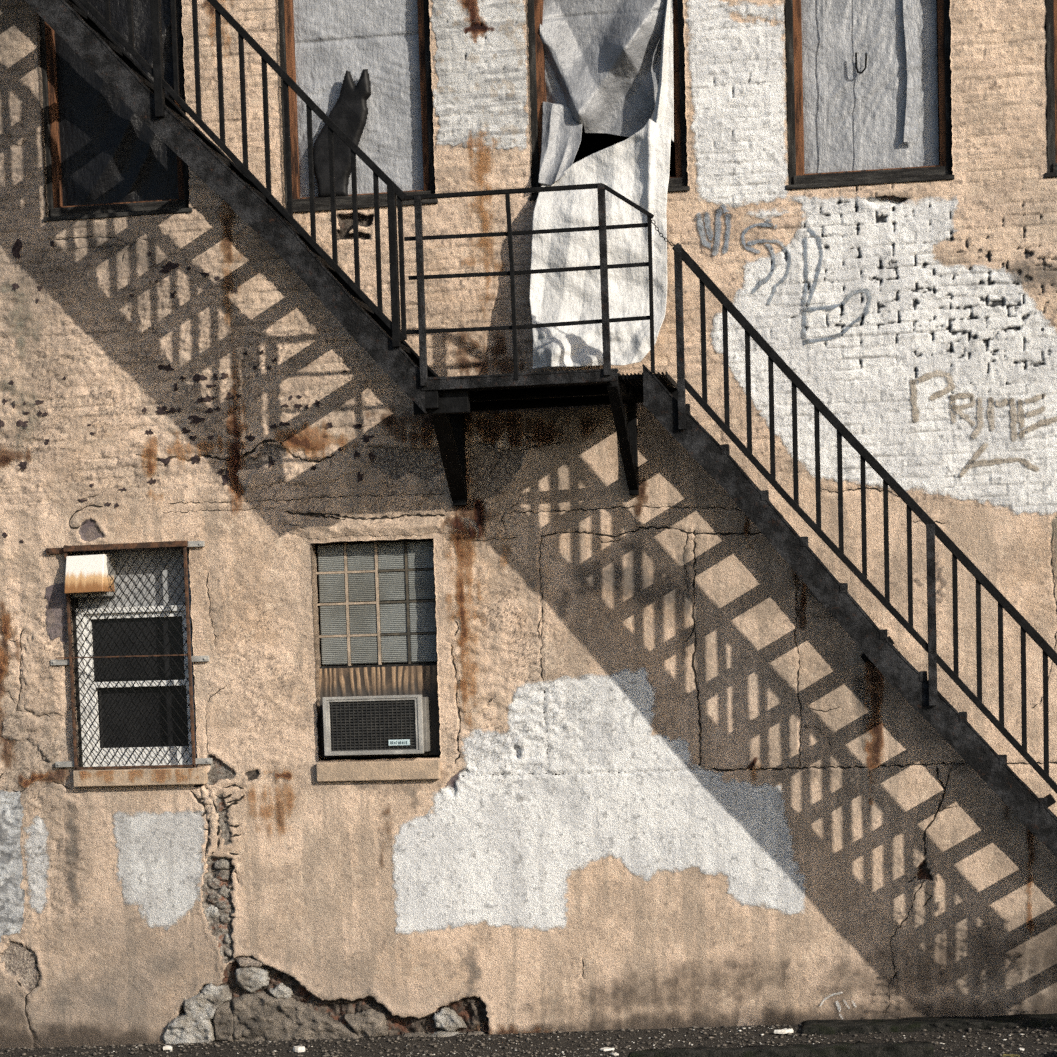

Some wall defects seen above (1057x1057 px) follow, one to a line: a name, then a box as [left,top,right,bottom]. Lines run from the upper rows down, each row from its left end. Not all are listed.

corrosion [461,0,494,42]
spalling [867,195,909,203]
corrosion [143,370,247,511]
crack [821,487,899,497]
corrosion [443,453,491,701]
corrosion [0,601,20,767]
flaking render [445,769,466,789]
crack [163,489,966,1009]
corrosion [865,662,884,770]
peeling [0,790,39,992]
flaking render [200,754,260,963]
crack [17,945,40,1039]